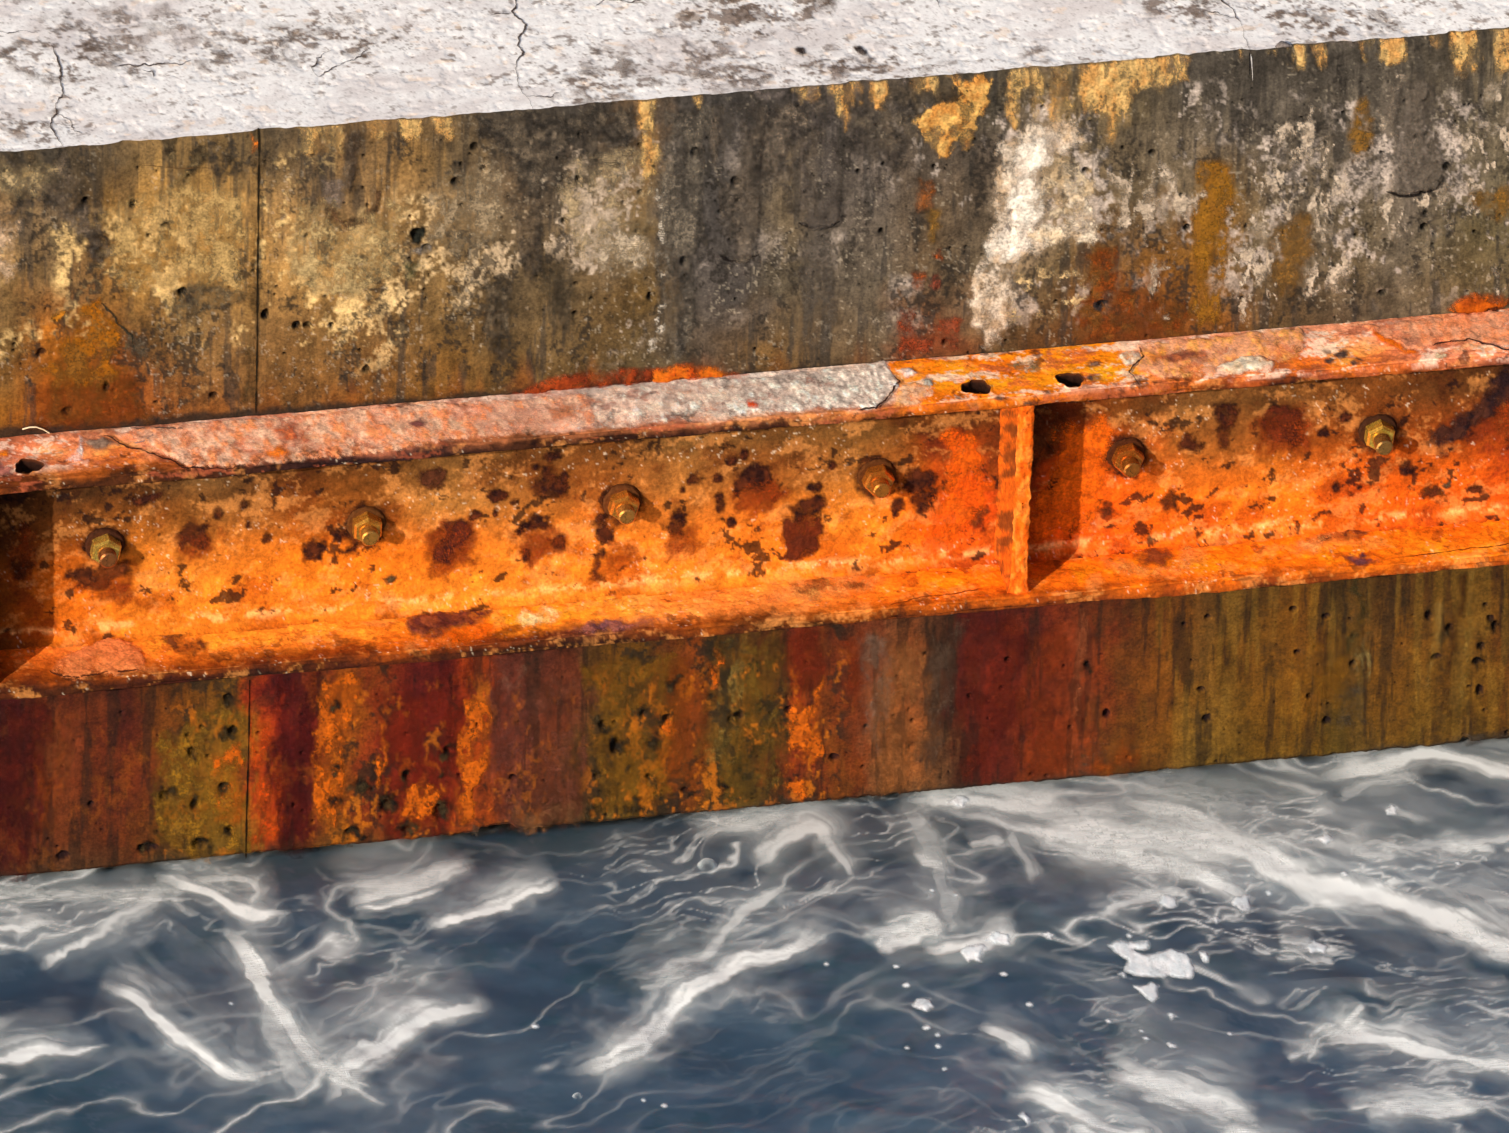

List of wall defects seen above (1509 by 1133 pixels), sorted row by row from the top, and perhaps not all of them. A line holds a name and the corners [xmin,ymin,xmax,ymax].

crack [2,30,84,146]
crack [119,60,190,77]
crack [311,50,366,77]
crack [492,0,559,108]
leakage [1362,38,1406,65]
leakage [1451,29,1509,71]
leakage [478,98,710,358]
leakage [751,55,1188,343]
rust [1076,161,1312,384]
rust [38,298,962,470]
rust [426,452,569,577]
rust [666,449,837,561]